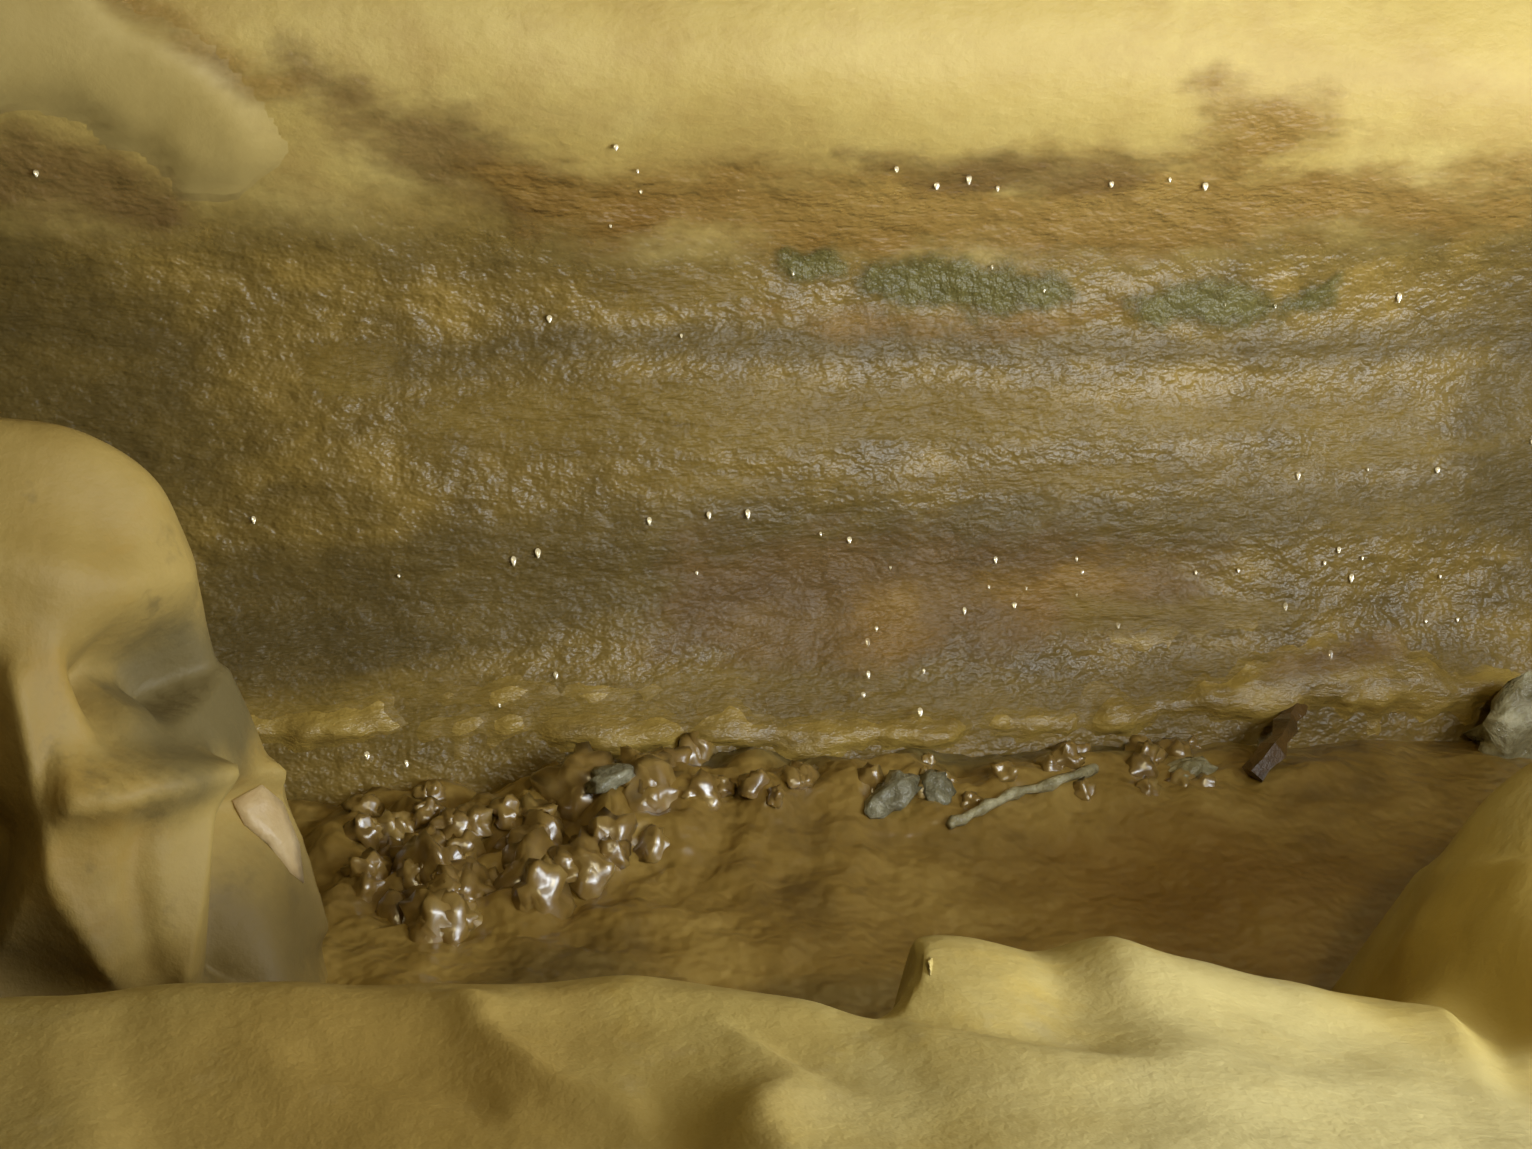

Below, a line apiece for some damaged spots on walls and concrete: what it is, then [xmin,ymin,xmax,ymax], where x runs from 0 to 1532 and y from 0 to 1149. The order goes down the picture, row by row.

damp [0,201,1532,806]